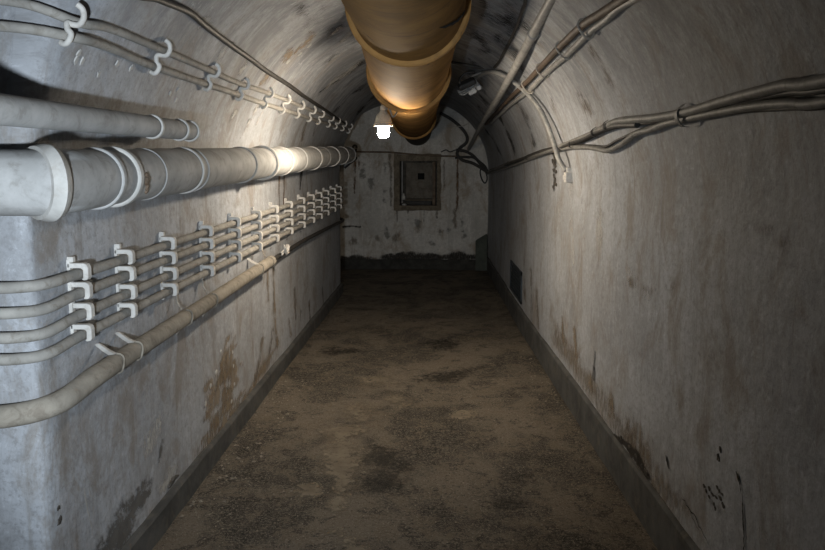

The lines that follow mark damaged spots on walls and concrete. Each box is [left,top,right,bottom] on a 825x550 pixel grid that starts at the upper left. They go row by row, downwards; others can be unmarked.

leakage [340,251,475,260]
leakage [554,319,678,505]
crack [736,472,745,550]